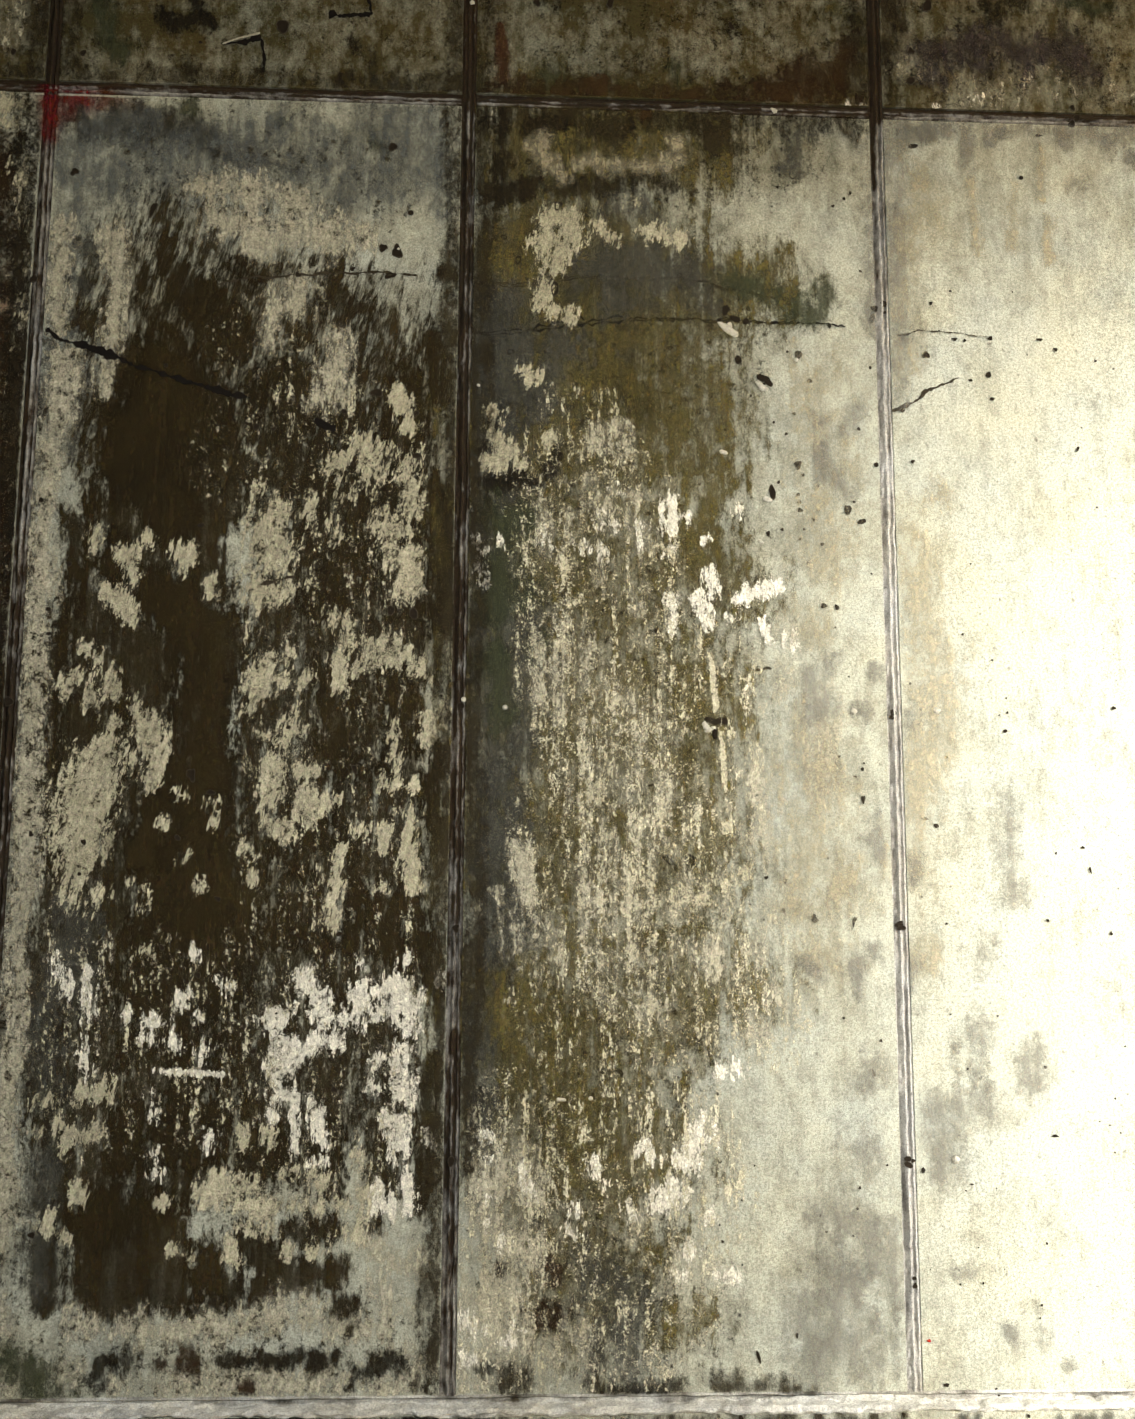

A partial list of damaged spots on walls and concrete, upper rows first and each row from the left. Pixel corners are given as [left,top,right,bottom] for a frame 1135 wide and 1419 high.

leakage [1,0,464,92]
crack [45,328,251,399]
crack [479,275,845,336]
crack [892,377,958,412]
crack [897,329,992,338]
leakage [457,0,1135,1394]
leakage [0,91,462,1399]